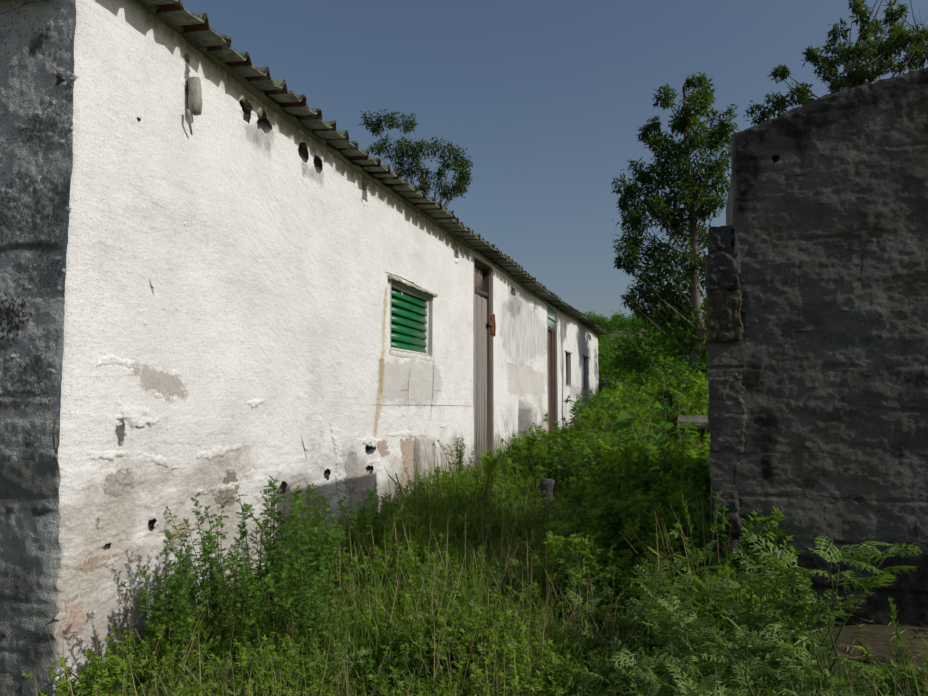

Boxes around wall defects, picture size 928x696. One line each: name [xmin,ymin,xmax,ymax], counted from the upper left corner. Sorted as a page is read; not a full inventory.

damp [29,29,49,55]
damp [0,241,58,252]
spalling [108,414,127,451]
damp [756,414,777,478]
spalling [101,468,135,497]
spalling [215,467,240,513]
spalling [147,513,160,531]
spalling [66,543,122,578]
spalling [54,589,87,652]